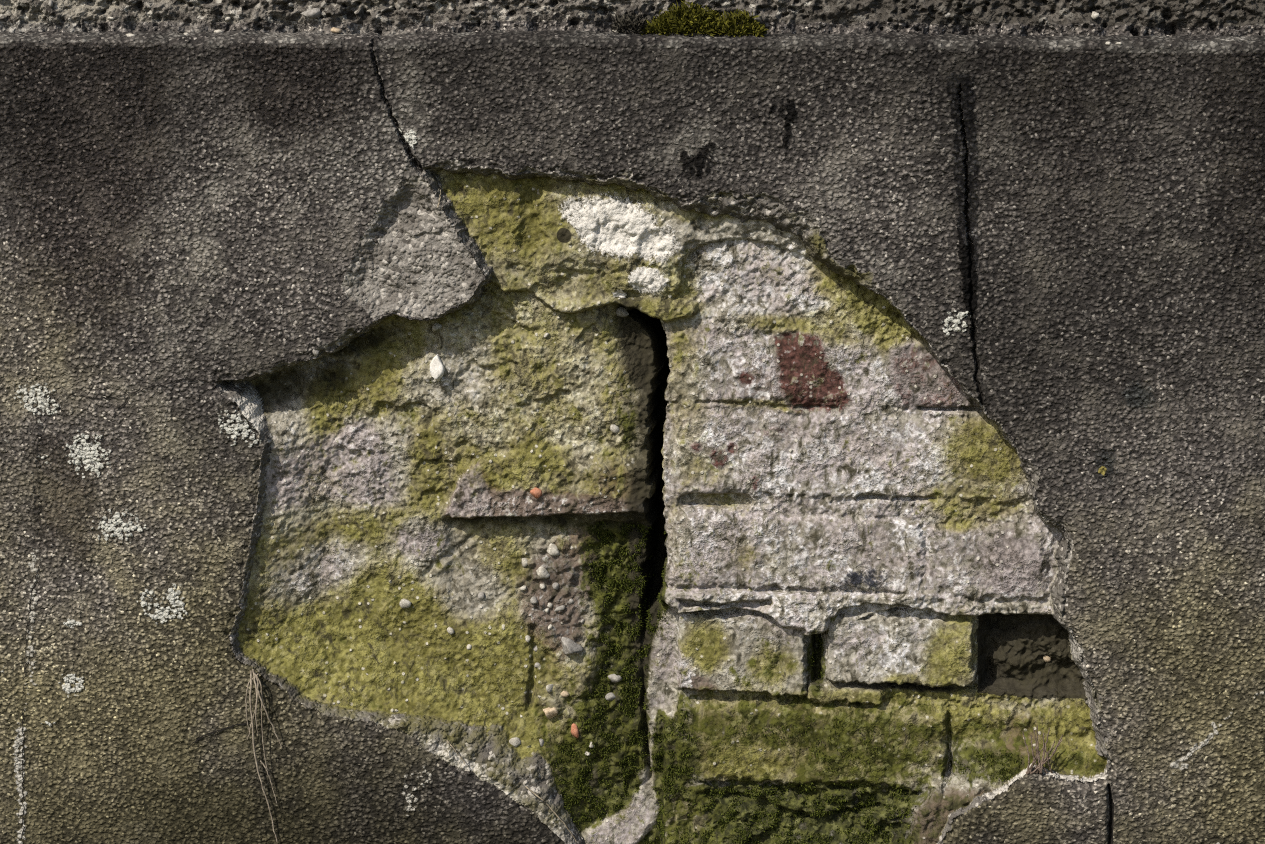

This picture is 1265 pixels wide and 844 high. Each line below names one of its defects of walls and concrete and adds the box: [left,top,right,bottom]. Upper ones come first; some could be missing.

crack [373,42,424,171]
crack [956,84,985,406]
spalling [215,158,1111,844]
crack [1107,784,1115,844]